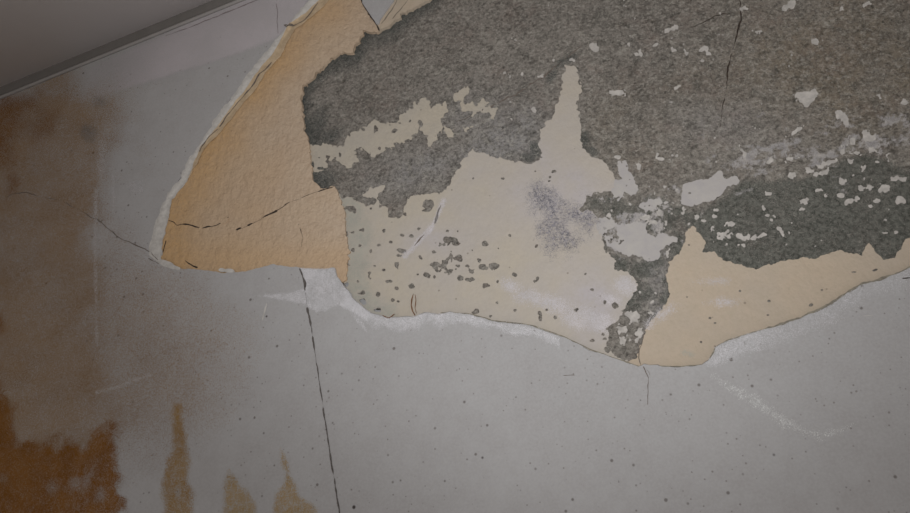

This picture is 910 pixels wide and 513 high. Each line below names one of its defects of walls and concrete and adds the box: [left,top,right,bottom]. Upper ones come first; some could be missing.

crack [693,1,742,126]
crack [6,187,332,264]
spalling [149,0,910,367]
damp [496,113,910,334]
rust [159,401,197,513]
crack [299,268,340,513]